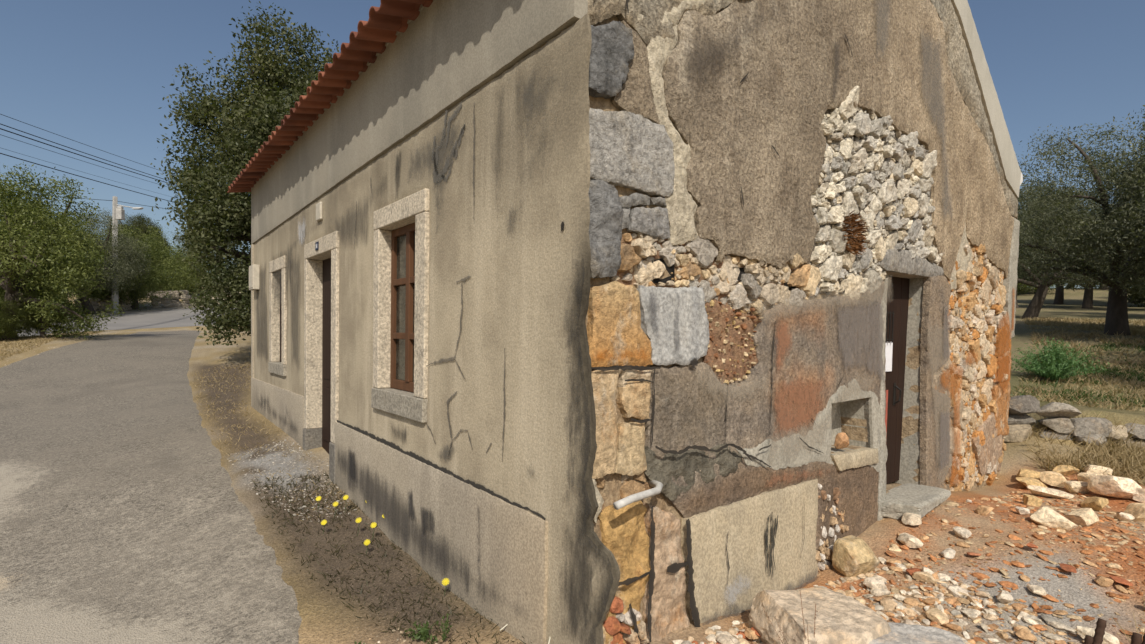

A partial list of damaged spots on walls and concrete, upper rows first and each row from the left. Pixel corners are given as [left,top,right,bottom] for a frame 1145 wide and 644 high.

spalling [610,85,1010,491]
crack [337,276,545,520]
crack [591,321,776,468]
water stain [342,453,449,572]
spalling [592,478,605,523]
spalling [619,472,653,503]
spalling [603,596,650,644]